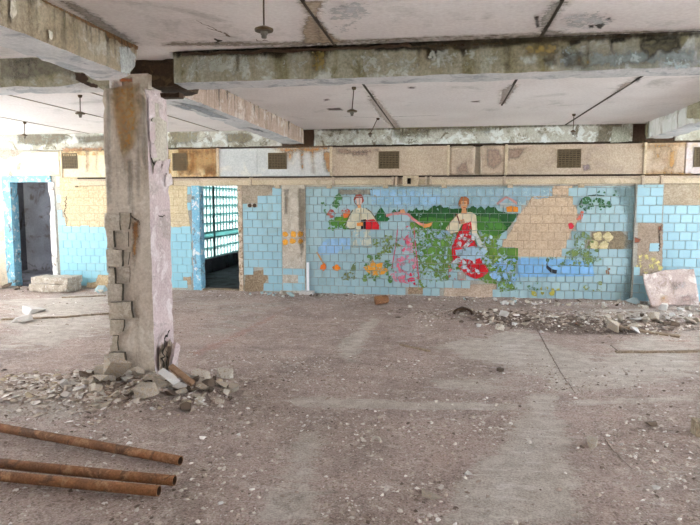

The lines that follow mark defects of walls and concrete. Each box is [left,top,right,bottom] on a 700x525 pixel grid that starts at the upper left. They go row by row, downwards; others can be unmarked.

peeling [428,40,479,69]
corrosion [114,78,136,150]
peeling [60,178,107,227]
peeling [502,186,578,259]
peeling [587,222,663,276]
peeling [244,270,268,292]
spalling [159,330,180,372]
crack [535,325,575,393]